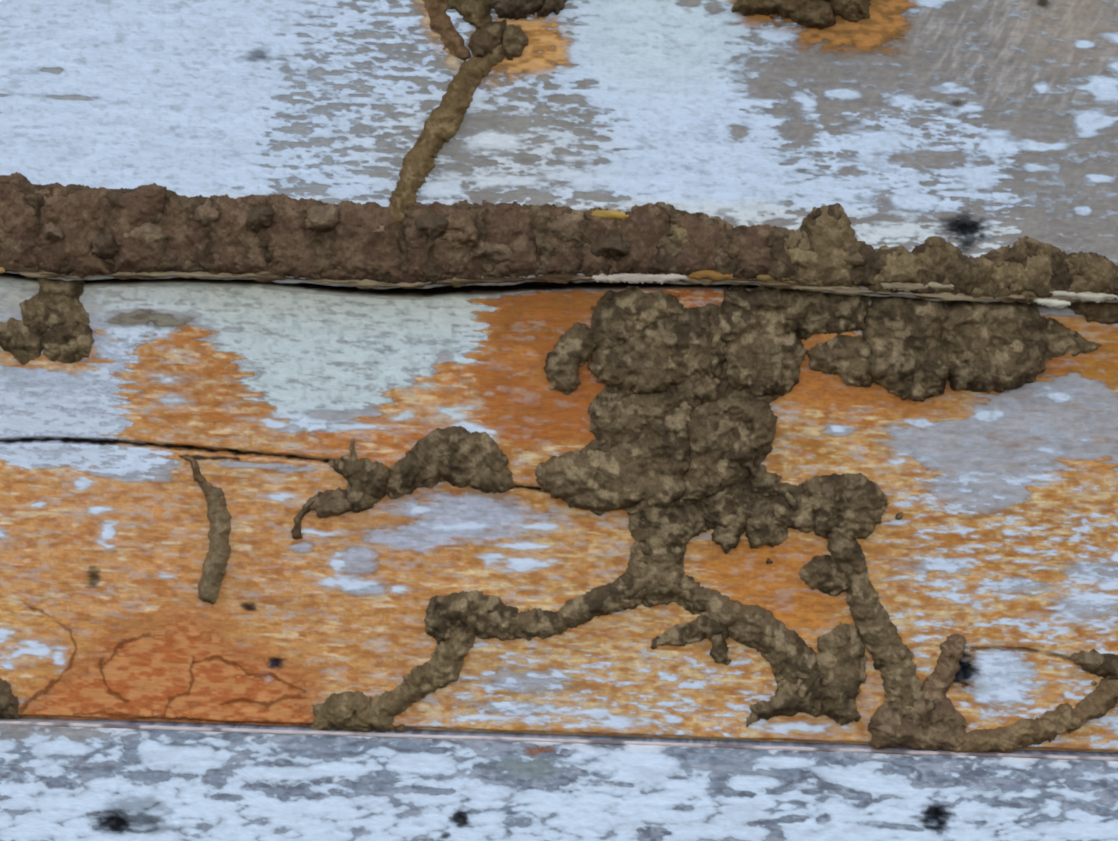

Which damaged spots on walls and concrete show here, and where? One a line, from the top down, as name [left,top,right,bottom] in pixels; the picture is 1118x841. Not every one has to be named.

peeling [0,0,476,207]
peeling [416,0,1118,258]
crack [0,438,329,463]
peeling [0,285,1118,841]